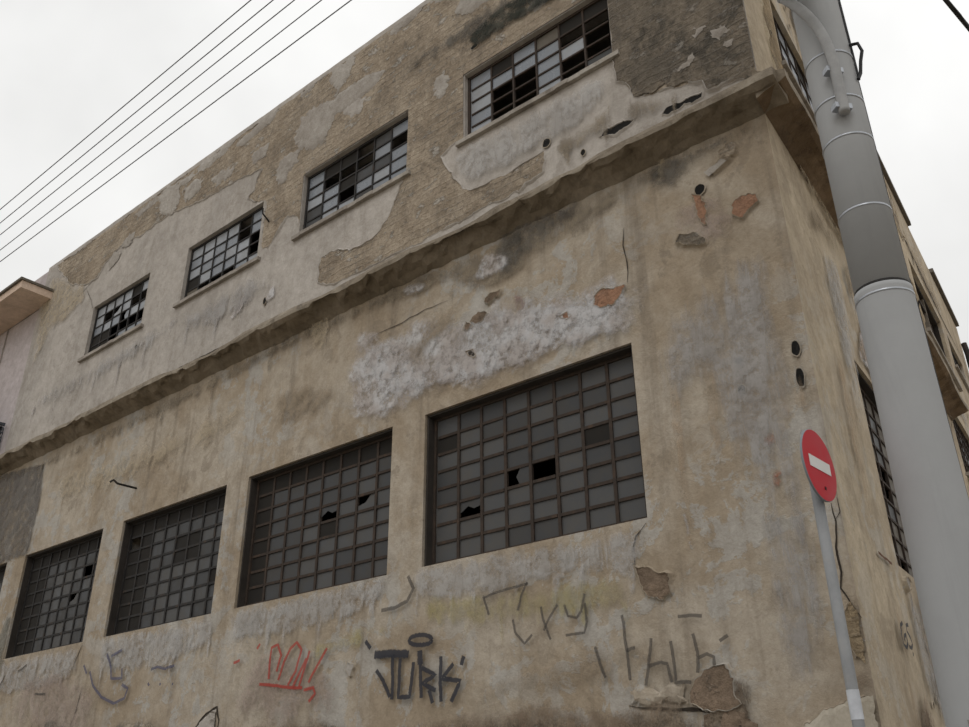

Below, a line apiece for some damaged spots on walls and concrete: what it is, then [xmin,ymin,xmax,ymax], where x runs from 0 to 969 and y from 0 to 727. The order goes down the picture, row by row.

spalling [614,53,694,97]
spalling [58,0,582,287]
spalling [704,141,740,176]
peeling [349,276,627,416]
crack [831,499,862,618]
spalling [625,662,758,727]